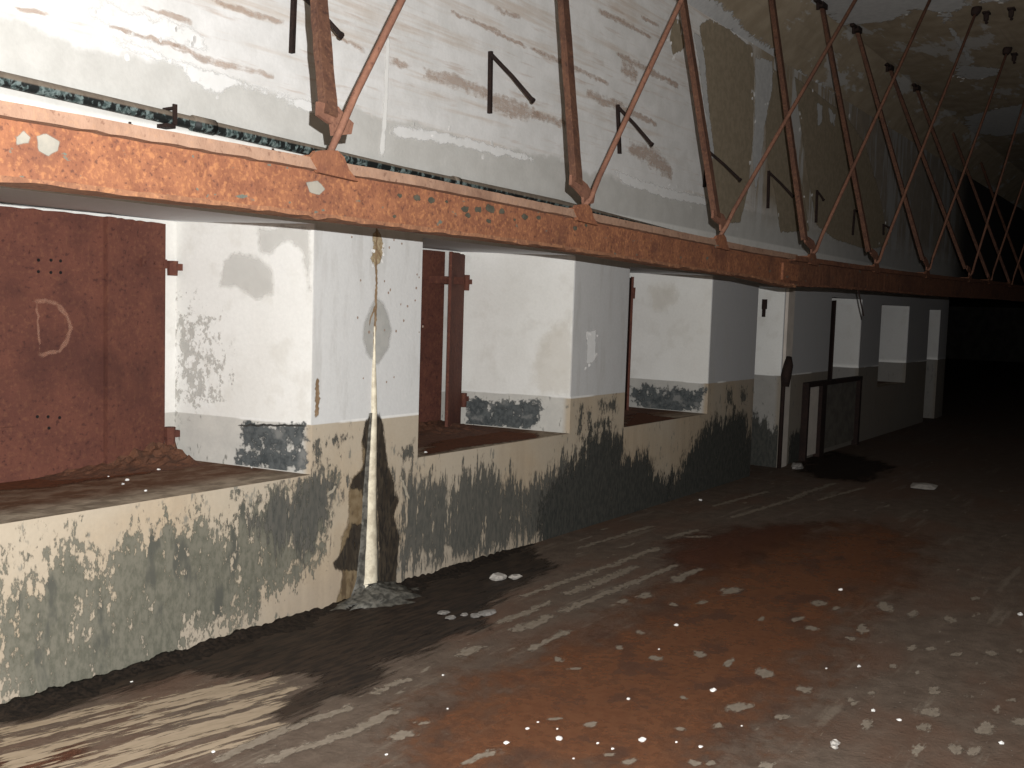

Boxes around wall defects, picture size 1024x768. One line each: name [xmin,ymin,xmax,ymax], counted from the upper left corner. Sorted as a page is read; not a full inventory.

peeling [615,0,888,249]
peeling [811,0,1009,26]
damp [0,300,895,768]